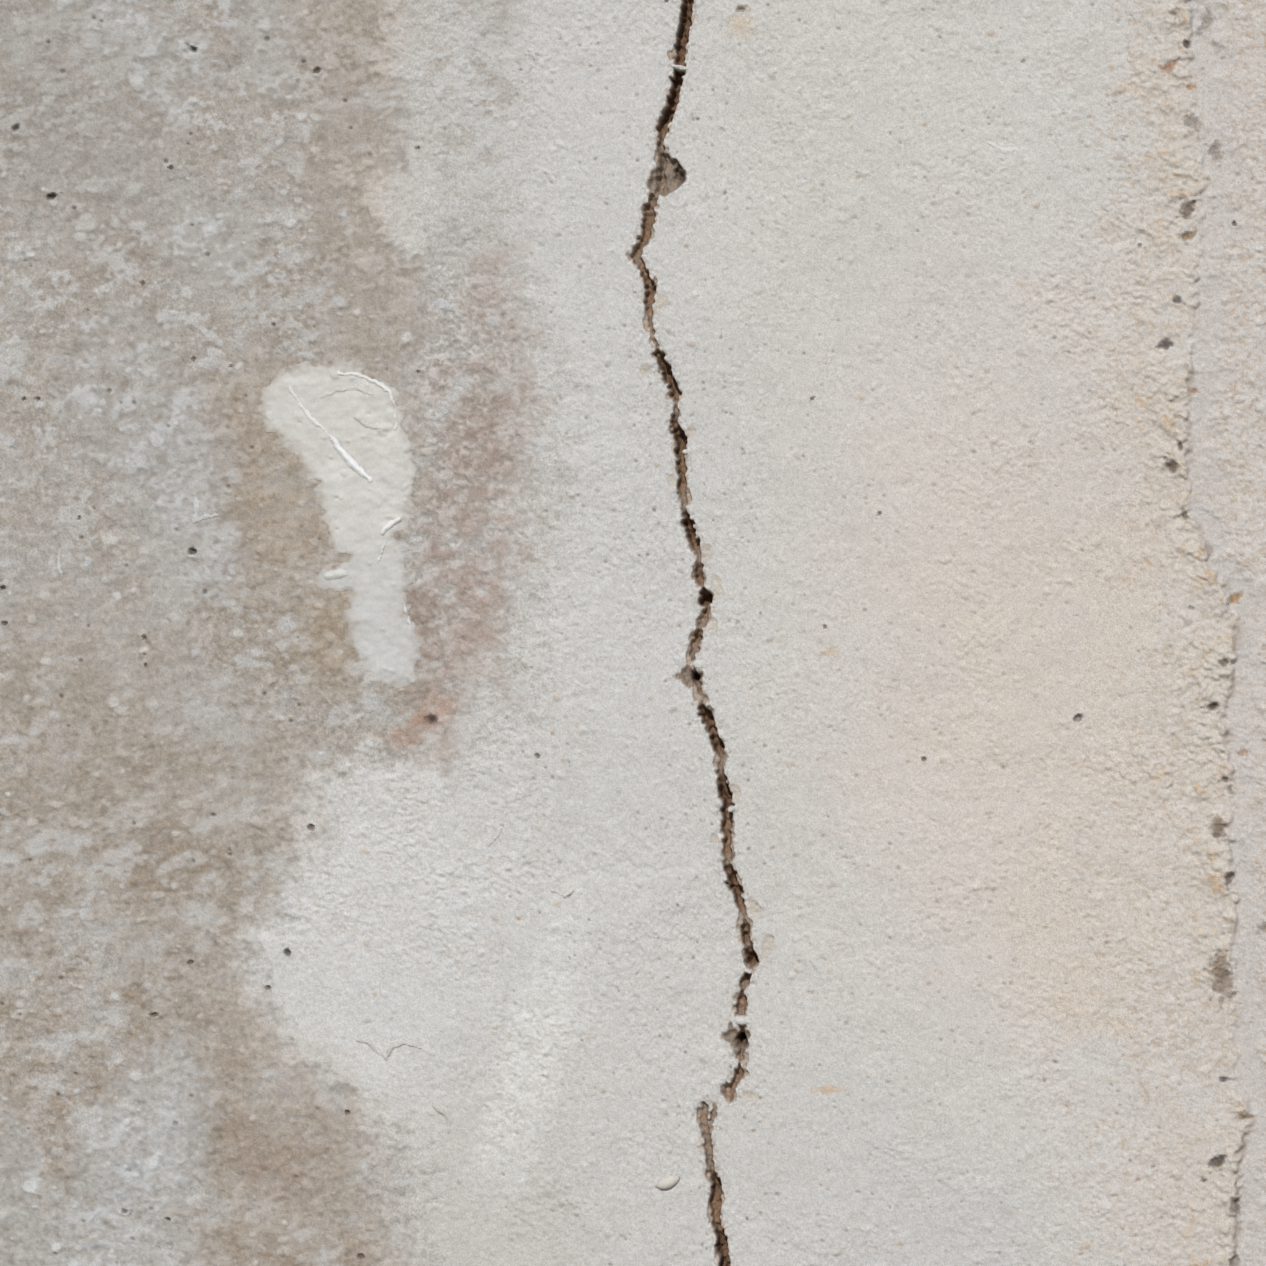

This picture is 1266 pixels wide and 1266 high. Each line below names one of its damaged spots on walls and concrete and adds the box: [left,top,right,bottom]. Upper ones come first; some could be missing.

damp [0,0,563,1266]
crack [624,0,777,1266]